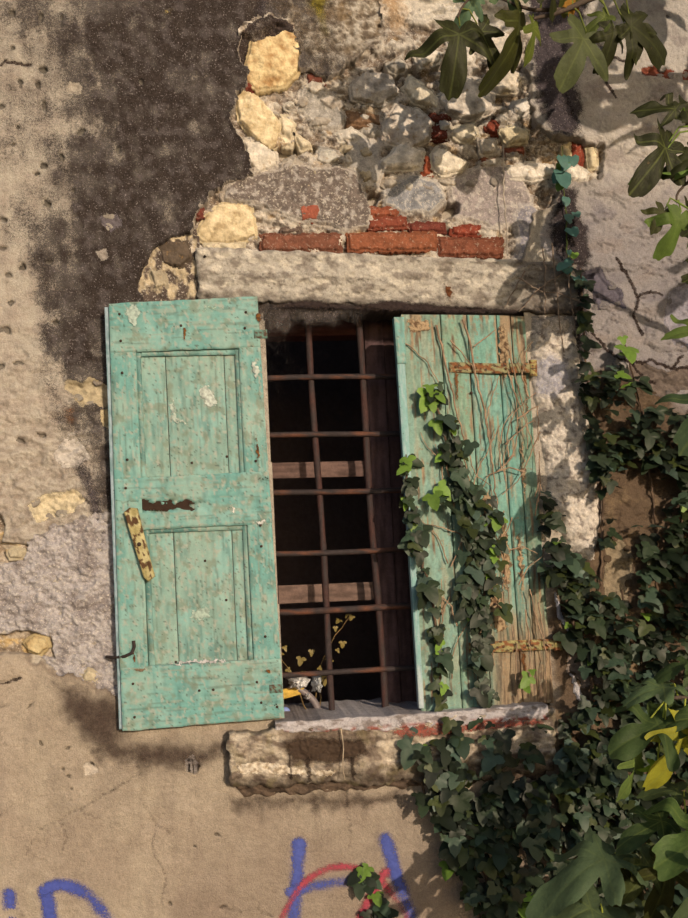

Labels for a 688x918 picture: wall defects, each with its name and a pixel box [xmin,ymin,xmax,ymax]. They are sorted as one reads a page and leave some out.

leakage [0,0,347,385]
flaking render [126,0,603,326]
crack [615,257,663,336]
crack [591,333,688,384]
leakage [55,401,112,541]
flaking render [0,489,118,697]
leakage [65,689,224,767]